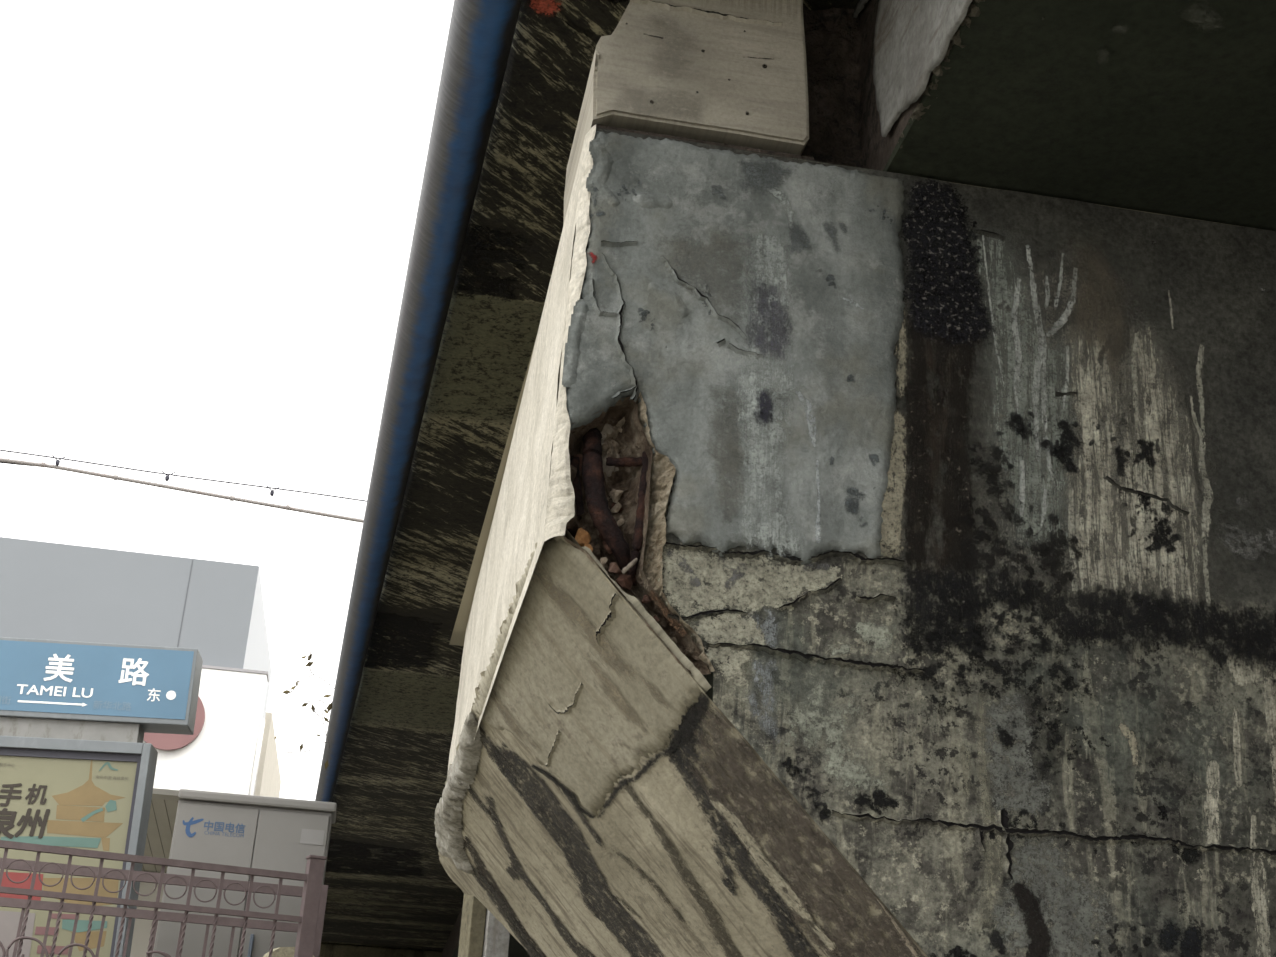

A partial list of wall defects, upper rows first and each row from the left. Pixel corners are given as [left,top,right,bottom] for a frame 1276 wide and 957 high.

flaking render [853,0,986,149]
crack [589,240,763,402]
flaking render [472,392,715,817]
crack [596,594,620,650]
crack [664,542,905,612]
crack [668,608,925,676]
water stain [856,177,1276,957]
crack [545,683,583,767]
crack [831,809,1276,880]